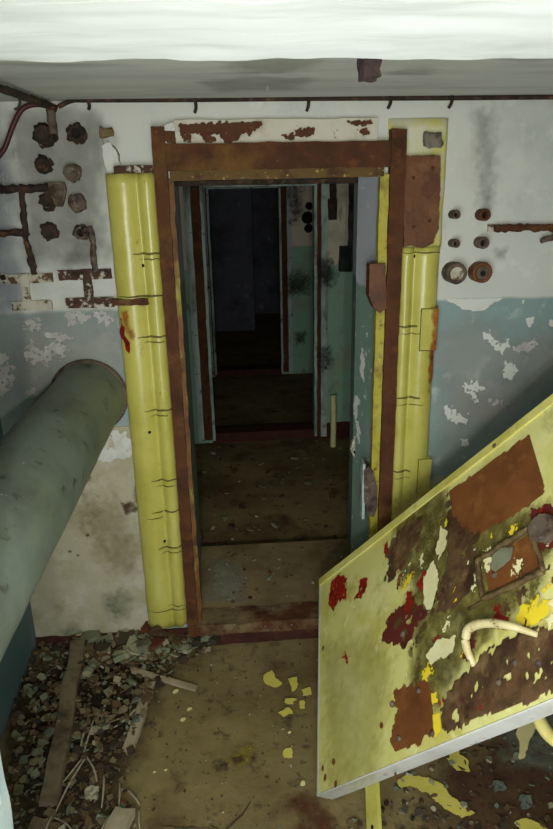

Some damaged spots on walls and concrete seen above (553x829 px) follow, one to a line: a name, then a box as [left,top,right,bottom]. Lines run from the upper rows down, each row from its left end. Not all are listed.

peeling [447,298,502,312]
peeling [23,310,115,367]
peeling [483,330,539,380]
peeling [444,405,469,425]
peeling [462,380,510,408]
flaking render [30,426,167,639]